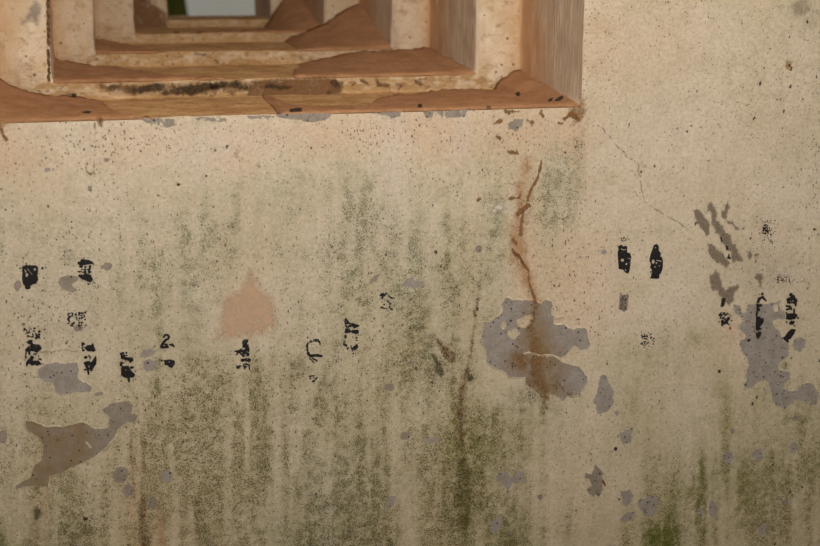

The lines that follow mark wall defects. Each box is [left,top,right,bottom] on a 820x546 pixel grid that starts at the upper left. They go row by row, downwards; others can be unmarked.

corrosion [558,103,584,124]
corrosion [508,160,542,303]
peeling [14,361,139,490]
water stain [457,366,473,447]
peeling [480,296,619,416]
peeling [582,463,606,497]
peeling [732,299,819,410]